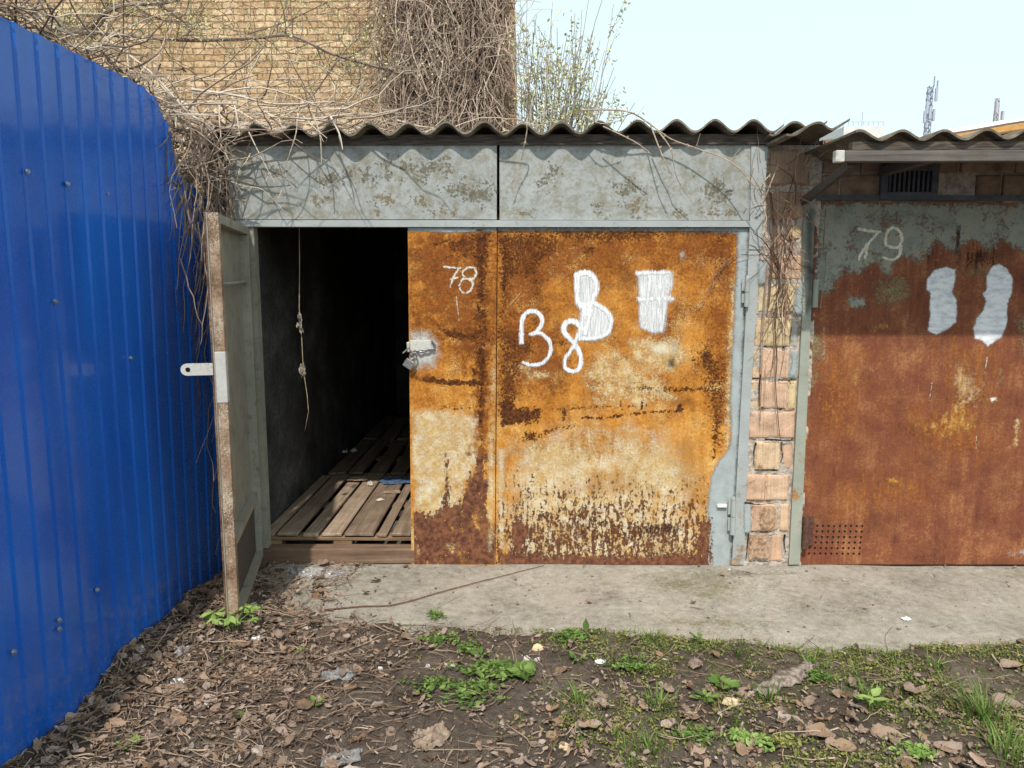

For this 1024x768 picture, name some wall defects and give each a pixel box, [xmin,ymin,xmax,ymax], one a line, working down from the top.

peeling [816,201,1024,308]
corrosion [927,225,1002,278]
corrosion [408,209,749,565]
corrosion [908,337,1010,468]